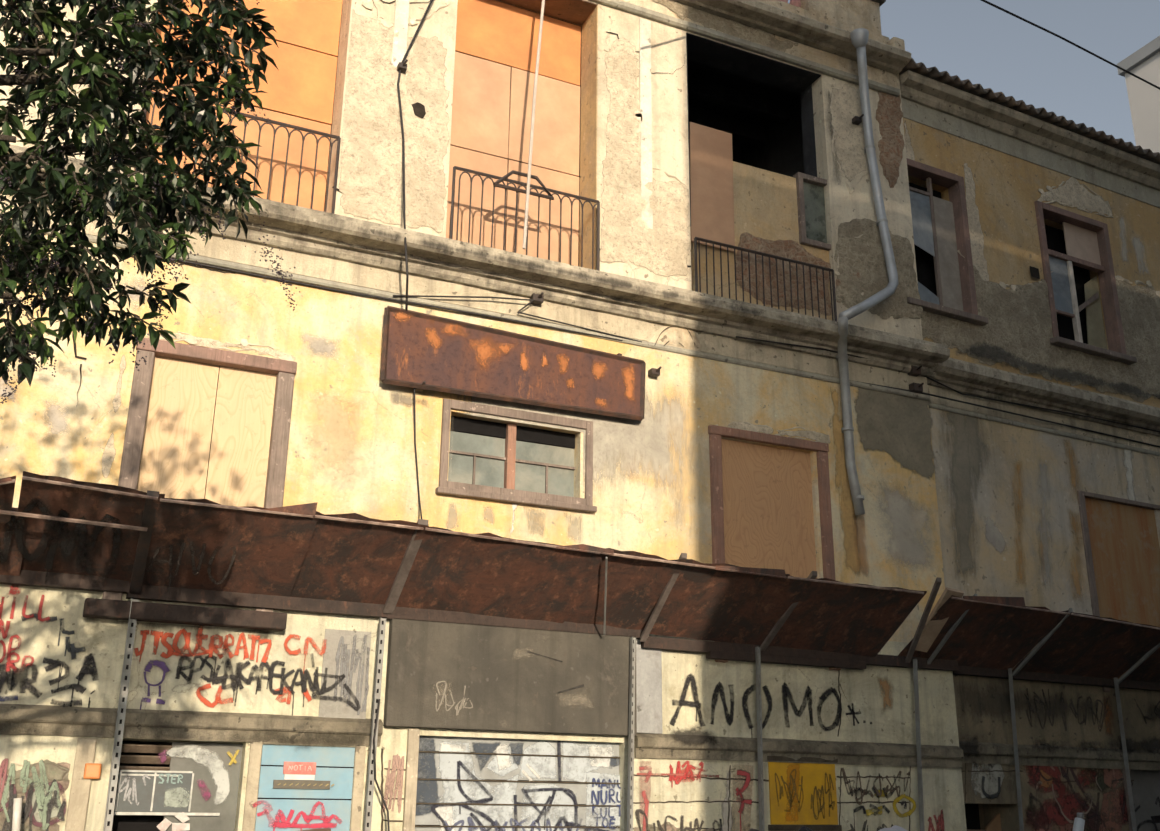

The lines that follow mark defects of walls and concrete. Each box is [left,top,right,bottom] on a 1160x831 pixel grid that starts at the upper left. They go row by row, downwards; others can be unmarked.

flaking render [830,83,905,194]
flaking render [736,163,1160,403]
rust [426,325,527,371]
rust [542,355,574,388]
rust [593,363,606,378]
rust [623,368,634,400]